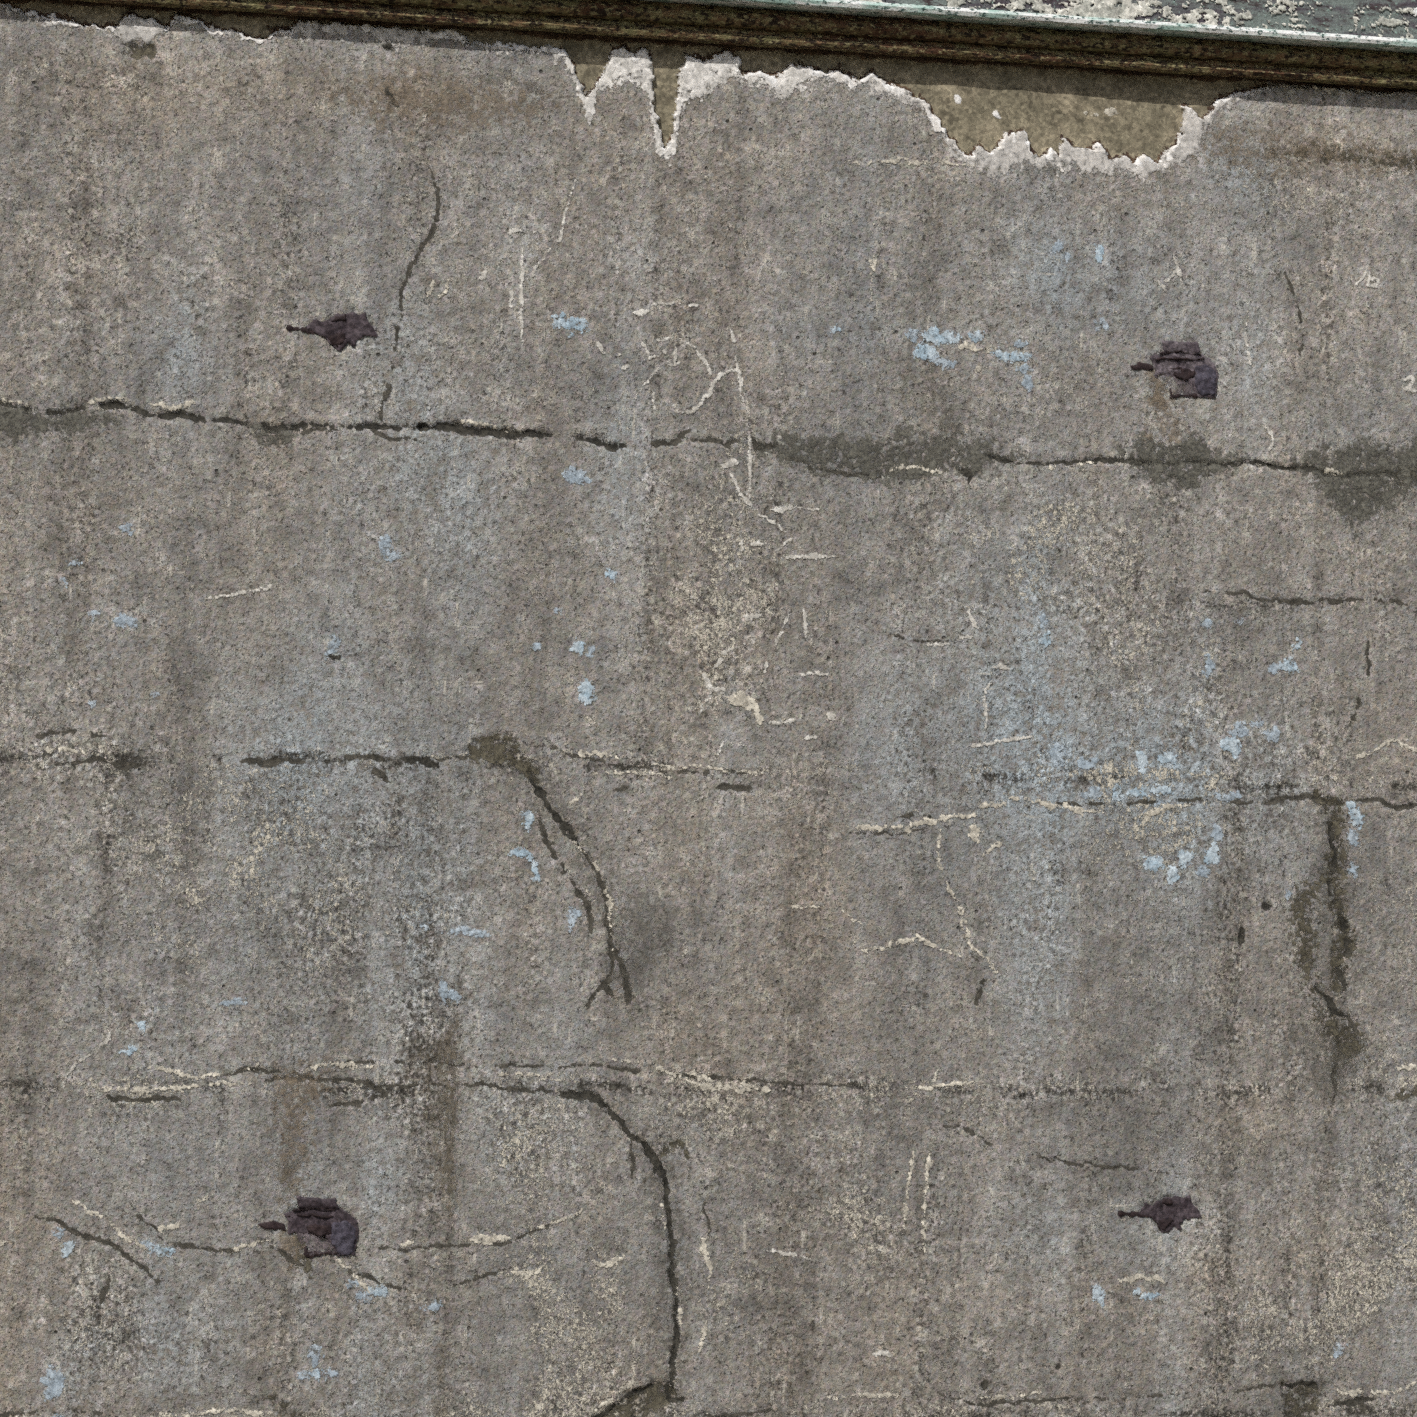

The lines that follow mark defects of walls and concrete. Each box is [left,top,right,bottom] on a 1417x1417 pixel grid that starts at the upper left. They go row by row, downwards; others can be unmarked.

spalling [0,0,1417,183]
crack [0,167,1397,485]
leakage [1291,436,1417,537]
crack [29,729,146,771]
crack [239,731,763,1010]
crack [779,789,1417,1104]
leakage [1285,879,1371,1067]
crack [34,1029,887,1395]
crack [0,1409,114,1417]
crack [704,1408,771,1417]
crack [815,1363,1218,1408]
crack [1327,1381,1417,1417]